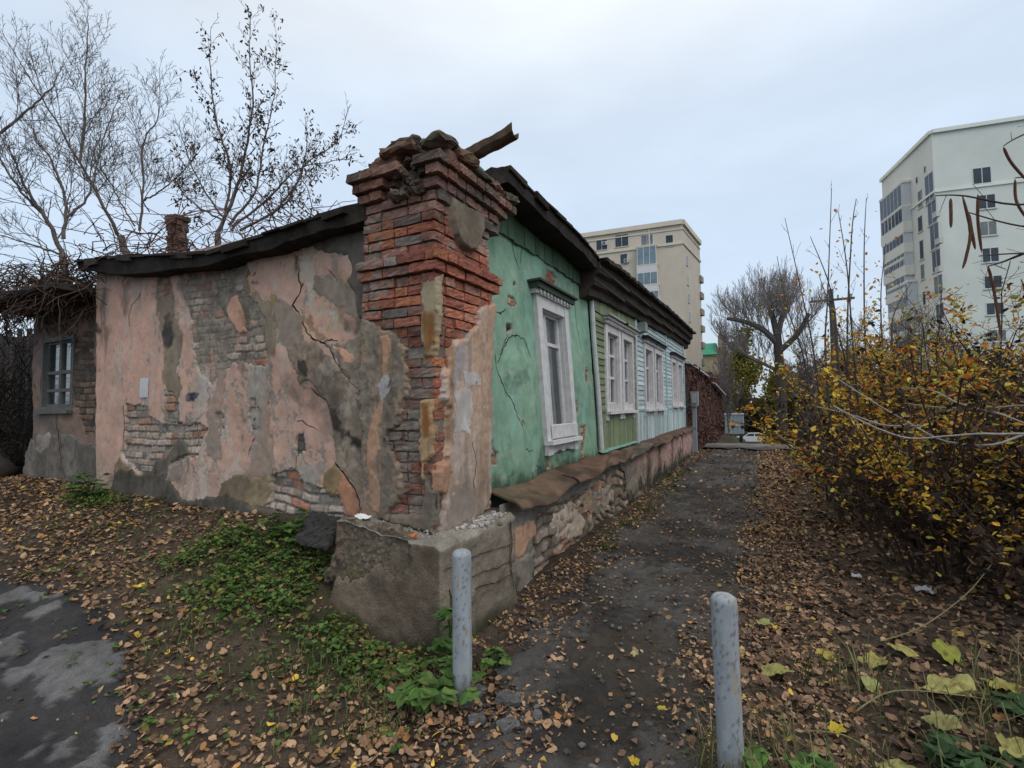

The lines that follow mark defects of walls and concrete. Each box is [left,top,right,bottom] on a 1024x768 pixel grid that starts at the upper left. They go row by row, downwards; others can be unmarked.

spalling [123,264,277,483]
crack [297,387,337,432]
crack [292,269,357,388]
flaking render [266,130,520,583]
crack [495,310,542,476]